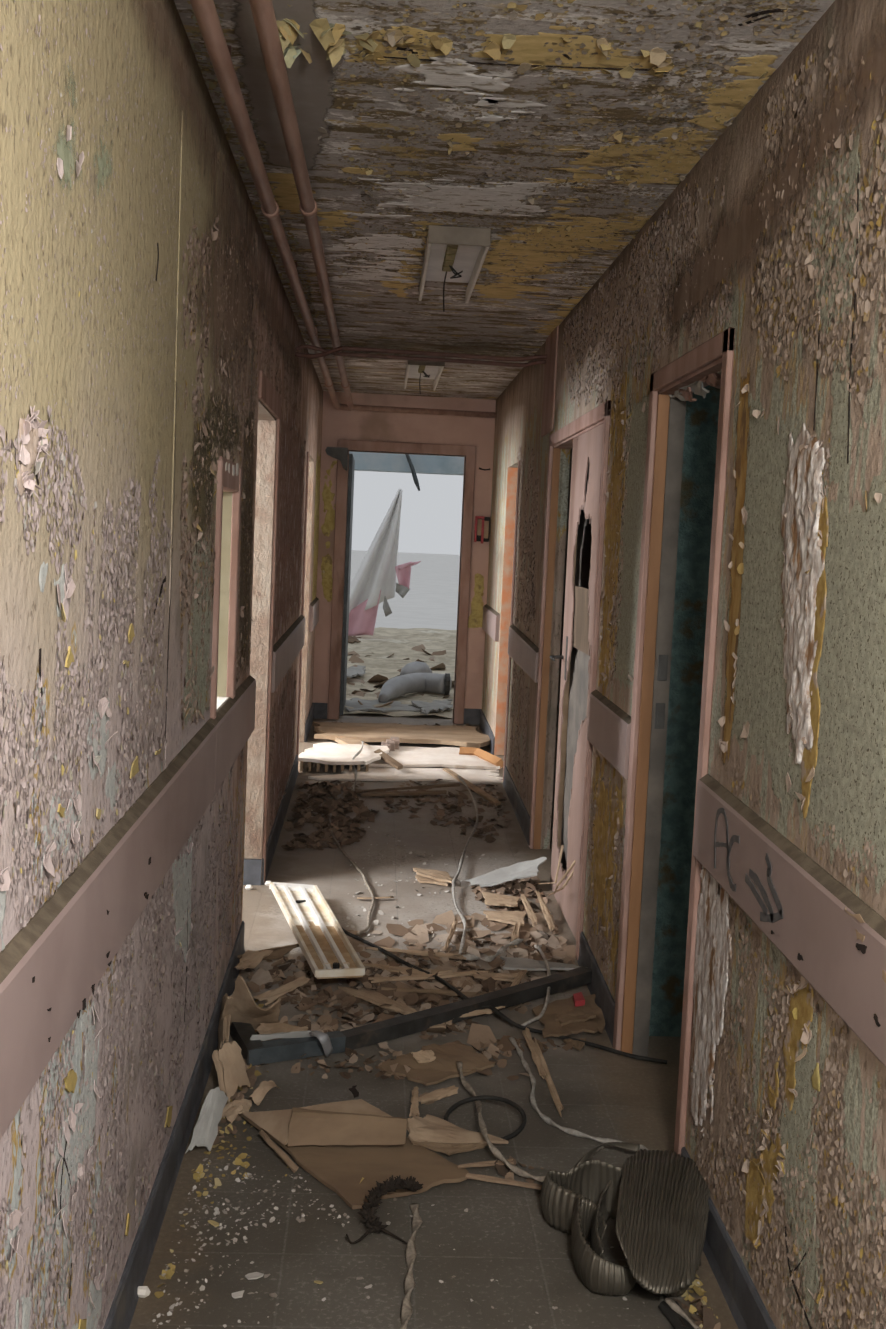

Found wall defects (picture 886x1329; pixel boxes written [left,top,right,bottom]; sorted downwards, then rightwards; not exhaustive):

peeling [0,0,337,950]
peeling [585,755,626,987]
peeling [0,747,244,1329]
peeling [191,1054,269,1204]
peeling [291,1041,414,1080]
peeling [247,933,603,1068]
peeling [486,1156,544,1183]
peeling [686,894,886,1329]
peeling [674,1274,721,1329]